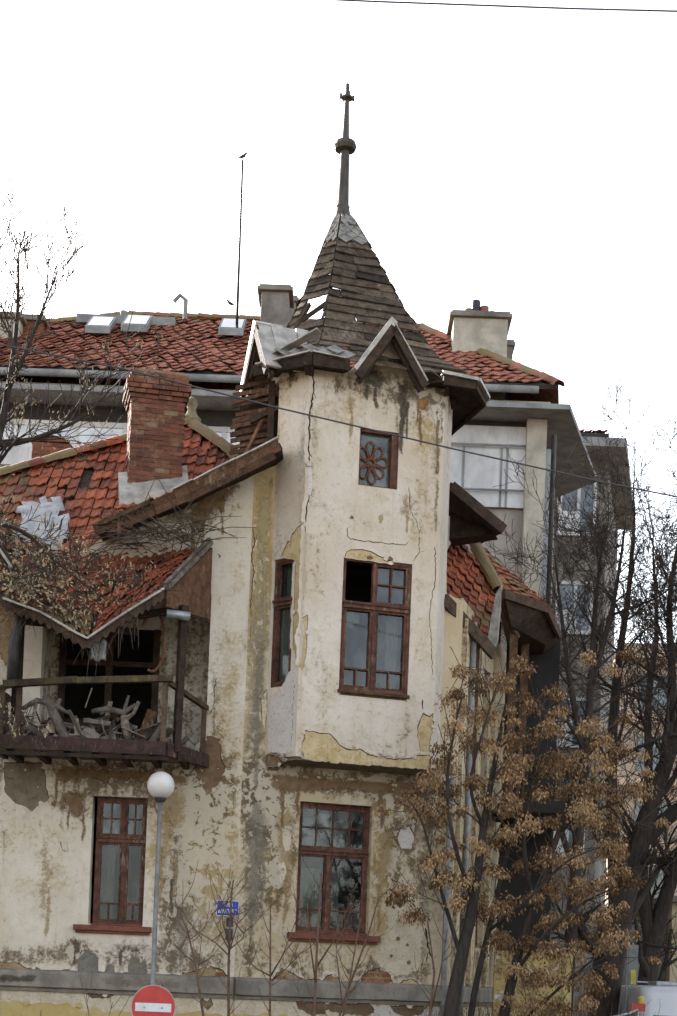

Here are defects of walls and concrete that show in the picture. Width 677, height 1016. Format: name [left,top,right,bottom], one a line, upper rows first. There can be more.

damp [364,371,385,408]
damp [398,384,409,453]
damp [431,404,442,428]
crack [297,375,315,616]
flaking render [277,522,313,672]
flaking render [0,603,15,678]
flaking render [0,757,53,812]
flaking render [264,708,438,884]
peeling [357,821,424,984]
flaking render [177,962,232,977]
flaking render [271,965,306,980]